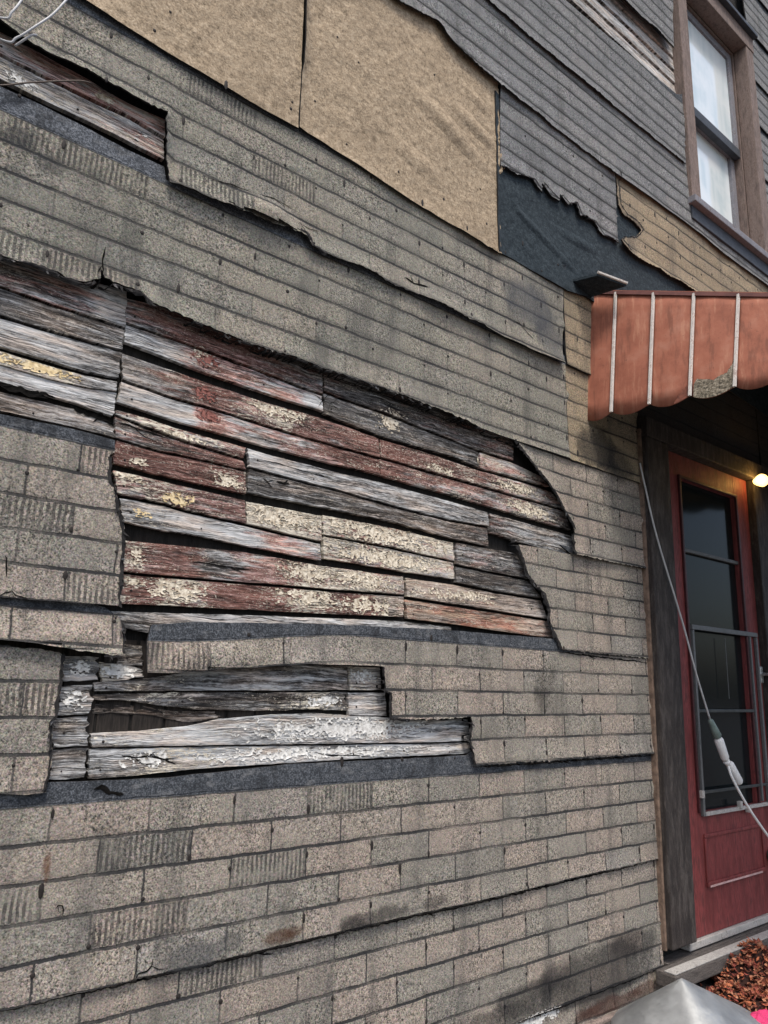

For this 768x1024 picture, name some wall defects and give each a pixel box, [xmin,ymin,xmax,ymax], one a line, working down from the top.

crack [97,247,106,280]
peeling [0,353,82,382]
peeling [155,428,210,445]
peeling [247,400,305,426]
peeling [375,408,408,433]
peeling [114,457,149,490]
peeling [212,473,244,490]
peeling [477,454,574,526]
peeling [119,547,207,604]
peeling [242,504,497,616]
peeling [60,655,137,679]
peeling [195,696,436,765]